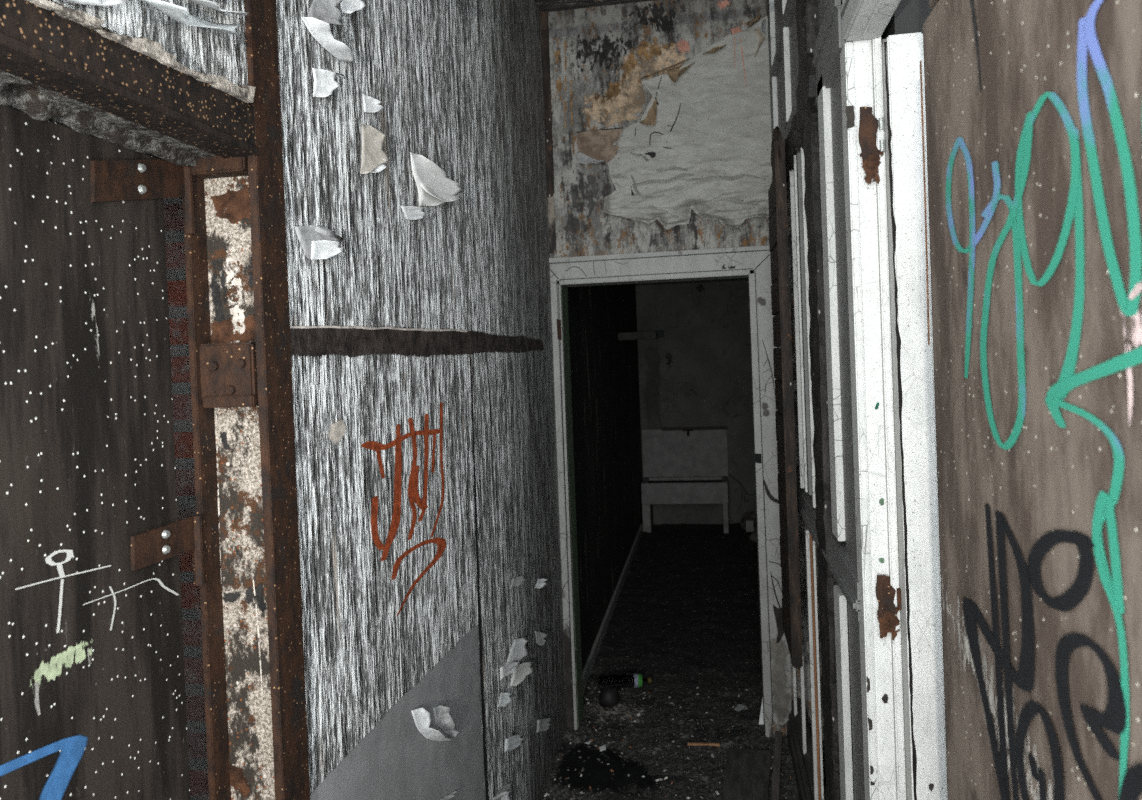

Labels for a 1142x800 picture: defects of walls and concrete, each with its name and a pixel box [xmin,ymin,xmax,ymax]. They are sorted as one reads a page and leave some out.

spalling [27,0,256,103]
peeling [301,0,366,97]
peeling [360,93,389,174]
corrosion [211,185,250,224]
peeling [401,152,464,220]
corrosion [860,150,884,188]
peeling [294,224,344,260]
corrosion [211,315,255,344]
corrosion [877,606,900,641]
peeling [498,631,548,707]
peeling [411,705,460,742]
corrosion [229,763,250,798]